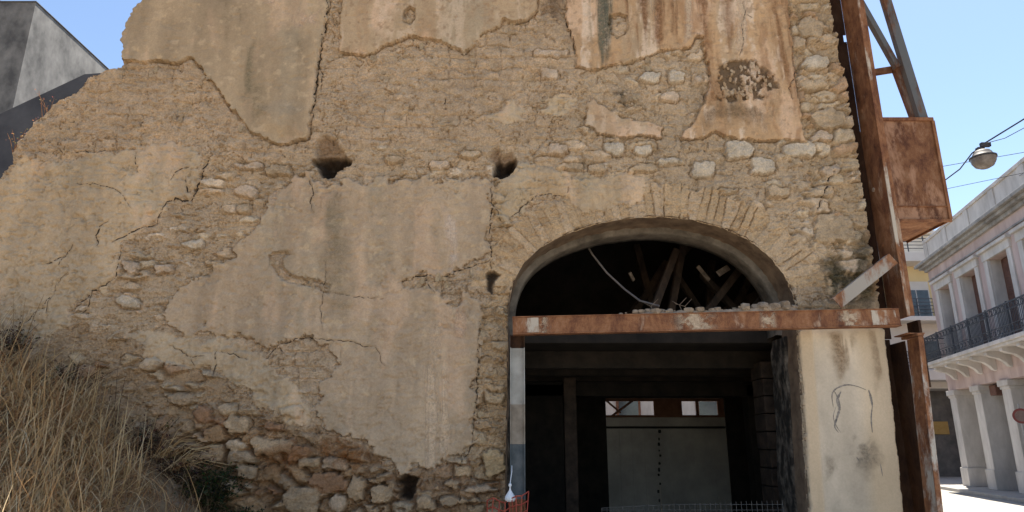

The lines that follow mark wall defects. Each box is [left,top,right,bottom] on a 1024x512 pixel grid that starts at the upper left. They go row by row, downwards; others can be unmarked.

crack [310,0,329,135]
flaking render [0,0,782,181]
crack [19,155,212,329]
flaking render [268,250,332,293]
flaking render [33,261,509,512]